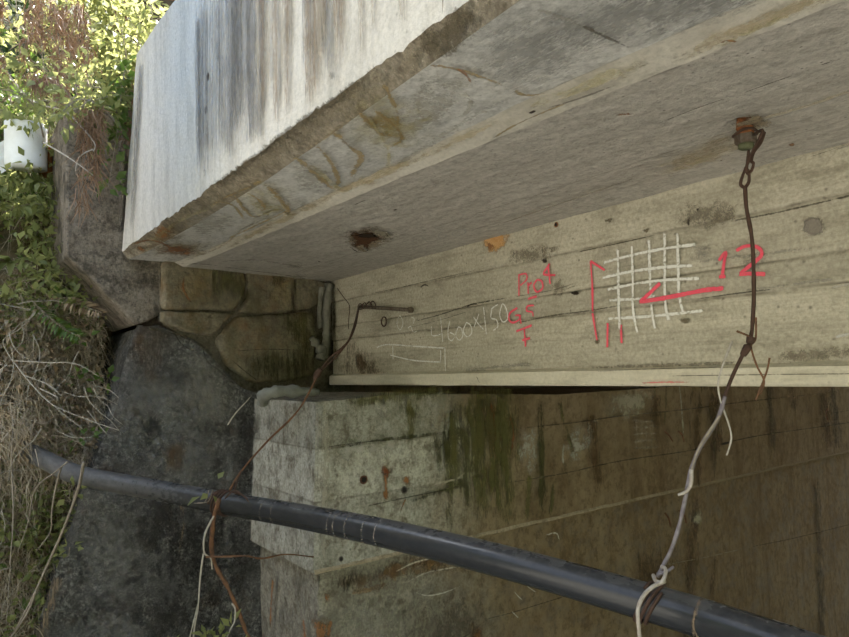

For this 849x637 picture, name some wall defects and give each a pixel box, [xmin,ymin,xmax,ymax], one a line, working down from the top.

damp [195,0,292,173]
damp [302,0,344,99]
spalling [343,227,389,253]
spalling [484,234,509,252]
corrosion [382,466,391,499]
damp [341,386,554,528]